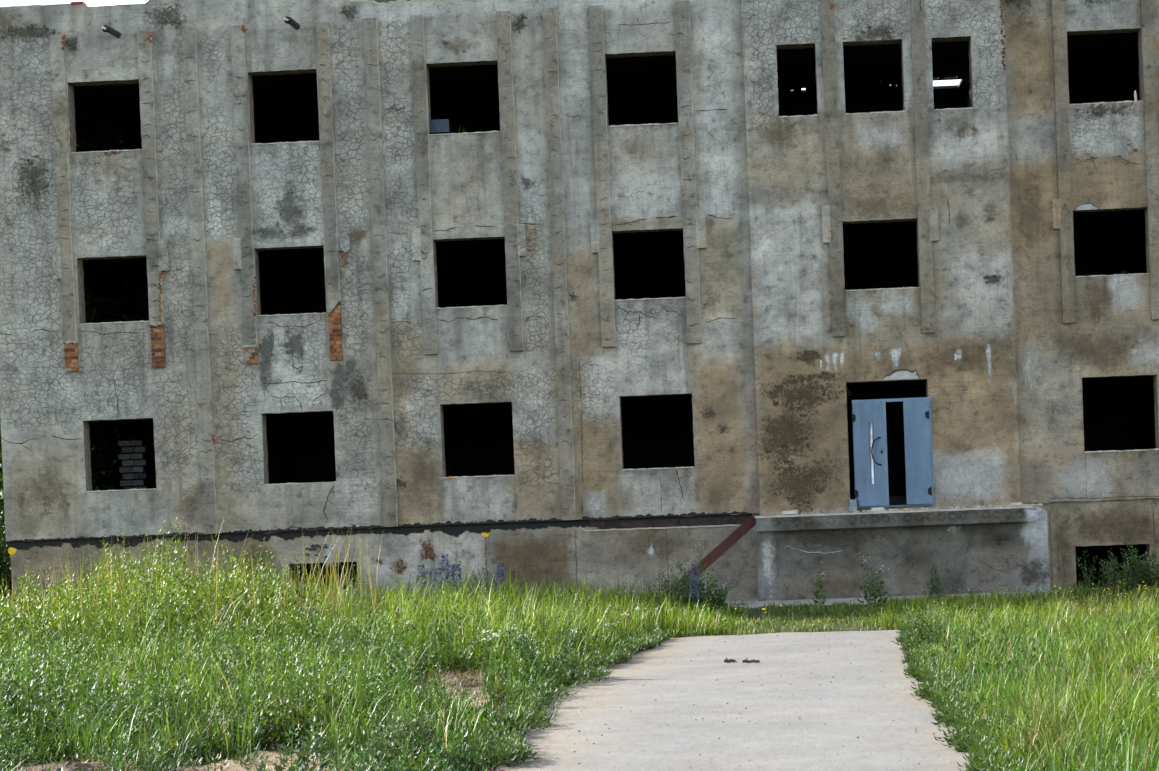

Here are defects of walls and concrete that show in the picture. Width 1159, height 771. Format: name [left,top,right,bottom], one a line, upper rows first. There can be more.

damp [1076,103,1137,118]
crack [0,0,1002,589]
spalling [149,267,170,368]
spalling [327,300,343,361]
spalling [63,340,79,371]
damp [820,352,844,369]
corrosion [421,542,435,561]